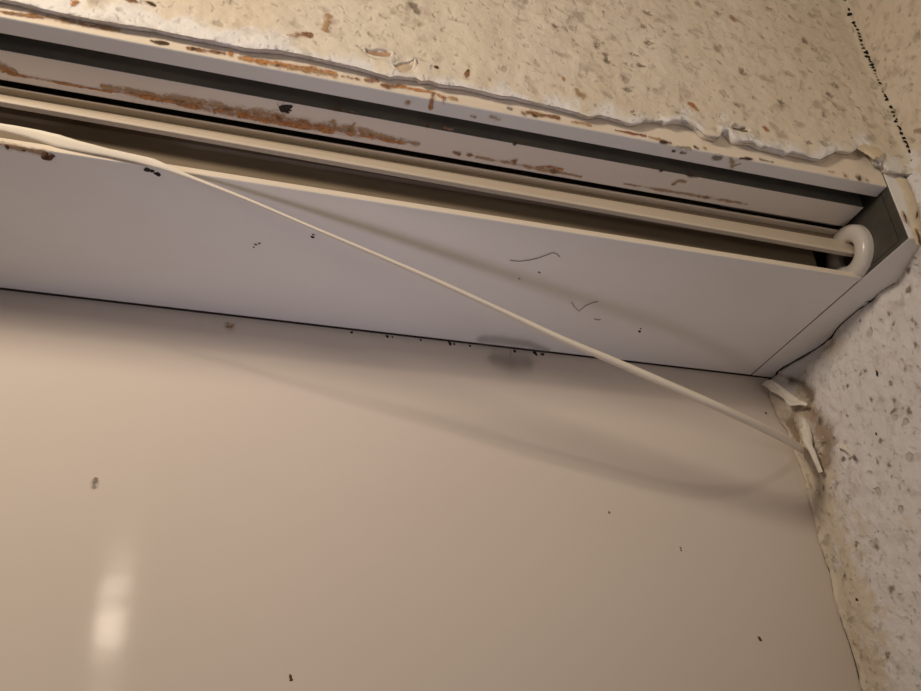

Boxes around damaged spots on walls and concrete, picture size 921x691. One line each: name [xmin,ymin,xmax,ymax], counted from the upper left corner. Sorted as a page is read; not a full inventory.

spalling [362,46,417,73]
corrosion [186,46,458,110]
corrosion [0,64,420,145]
corrosion [507,107,560,120]
spalling [729,122,753,134]
corrosion [453,151,582,178]
spalling [857,144,884,160]
corrosion [624,180,747,205]